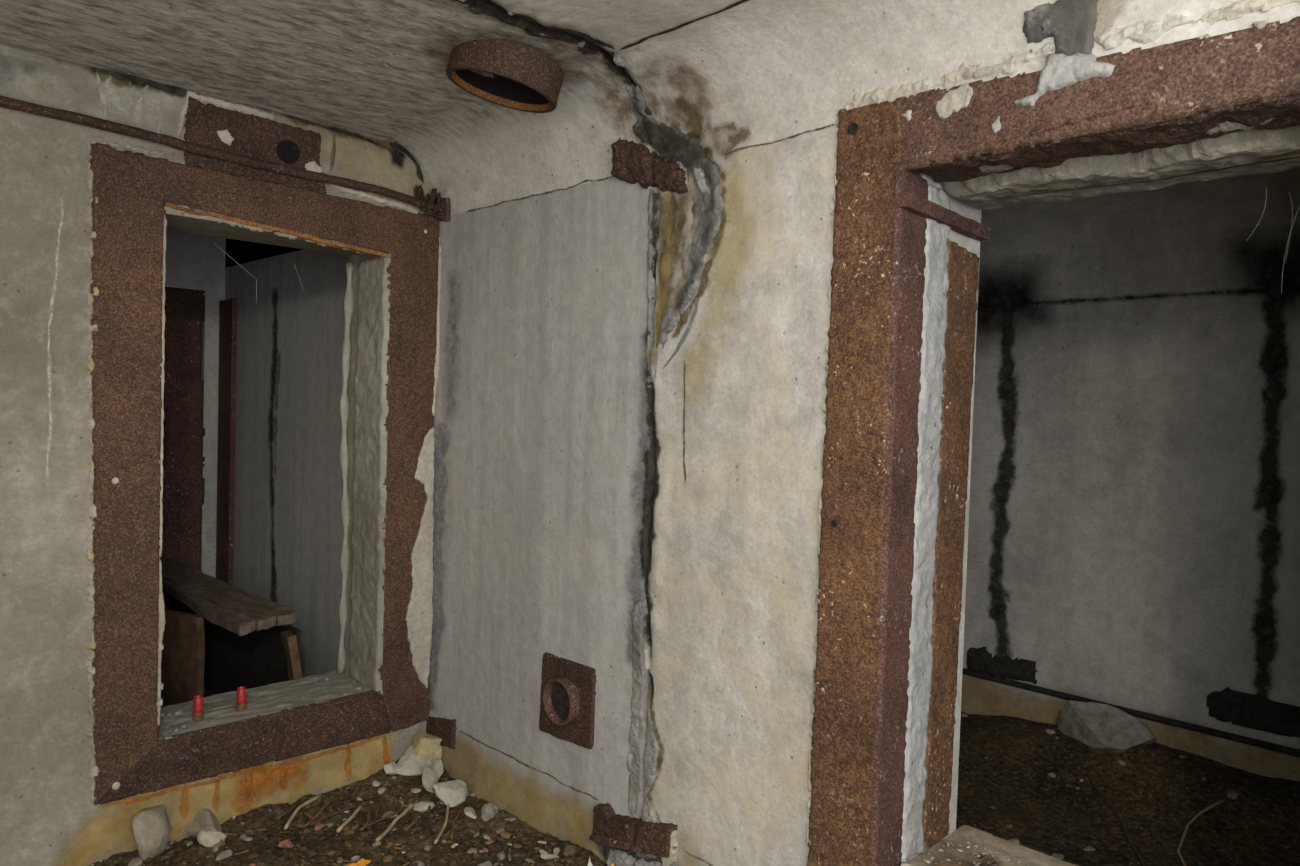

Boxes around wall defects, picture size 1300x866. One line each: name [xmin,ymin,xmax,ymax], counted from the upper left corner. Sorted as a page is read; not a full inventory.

water stain [648,66,749,153]
flaking render [1094,0,1300,51]
flaking render [406,237,441,688]
crack [628,193,698,710]